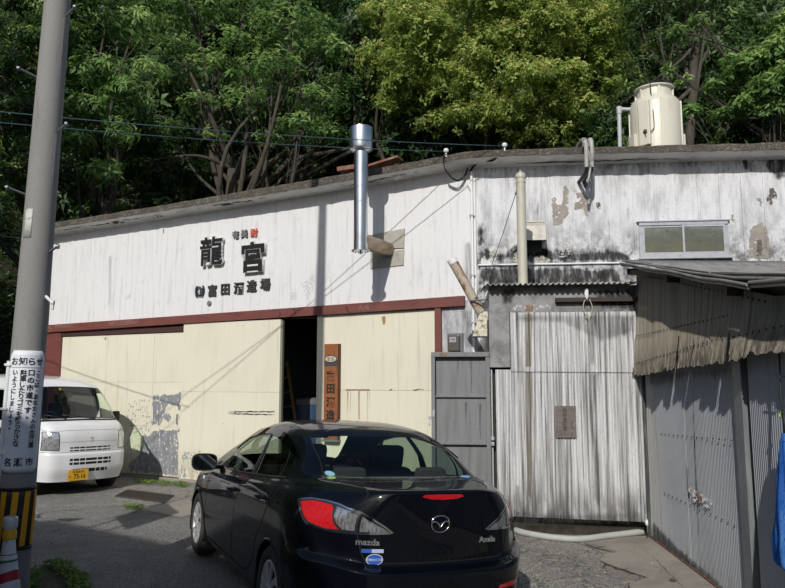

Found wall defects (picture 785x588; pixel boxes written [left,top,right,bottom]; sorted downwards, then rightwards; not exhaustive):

water stain [767,159,785,179]
peeling [551,185,601,233]
peeling [757,188,778,207]
peeling [748,222,770,259]
water stain [478,228,634,311]
peeling [126,392,200,477]
peeling [688,487,713,509]